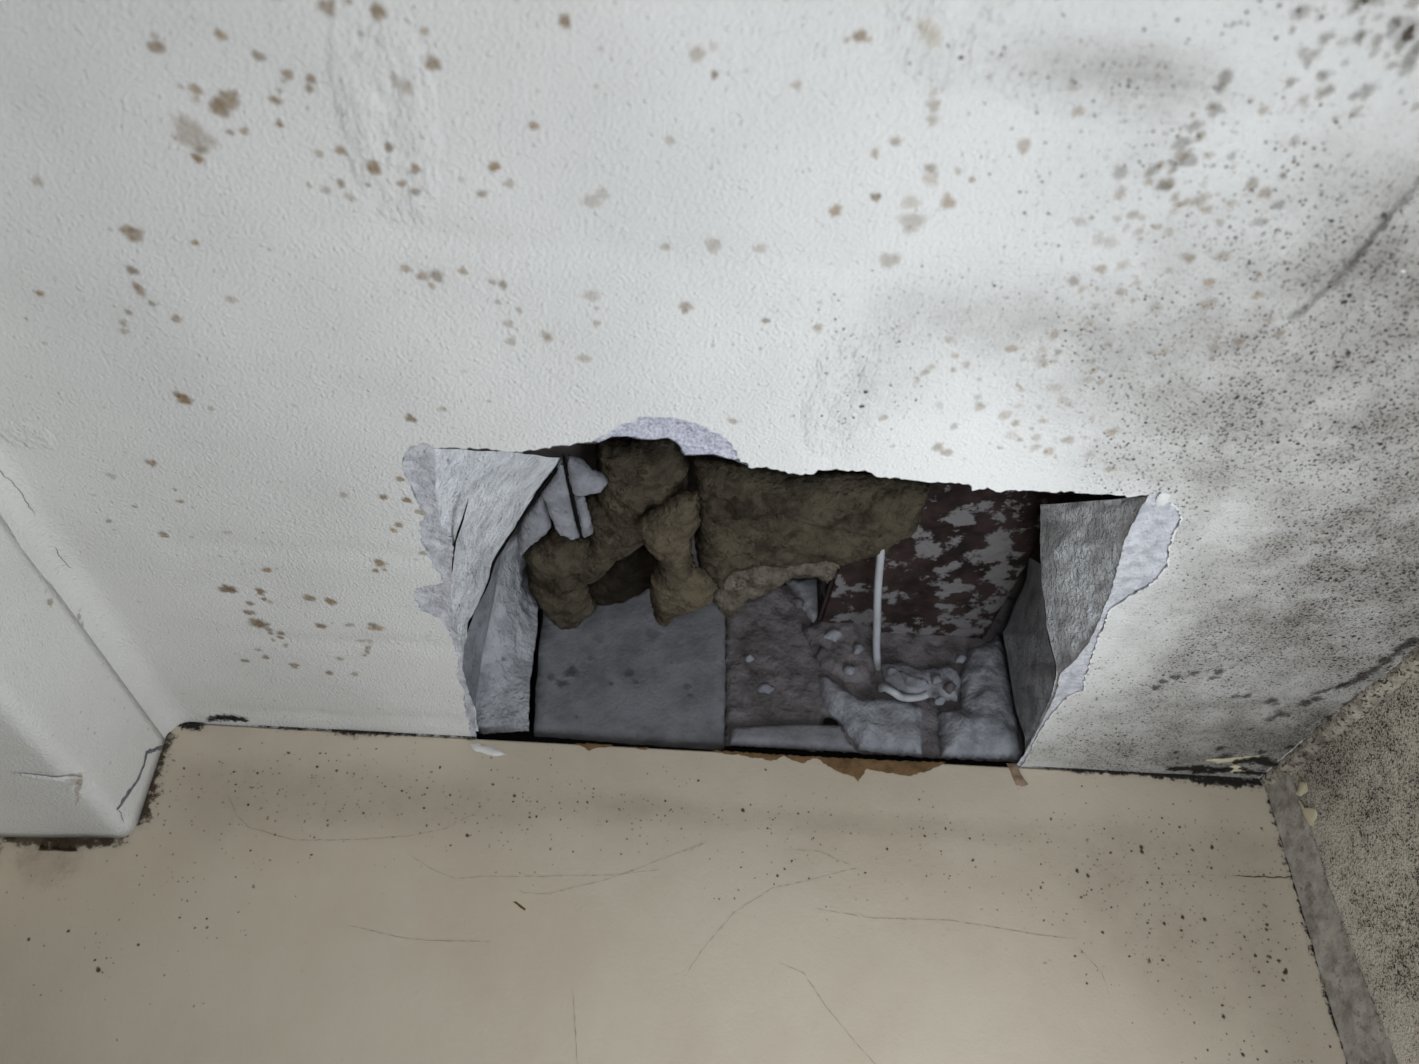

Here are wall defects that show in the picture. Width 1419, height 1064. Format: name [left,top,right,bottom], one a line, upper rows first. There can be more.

leakage [211,93,246,134]
leakage [998,0,1343,206]
spalling [582,417,748,465]
spalling [403,442,561,739]
leakage [219,94,1419,1064]
peeling [713,750,945,782]
peeling [933,682,957,705]
spalling [1003,492,1180,767]